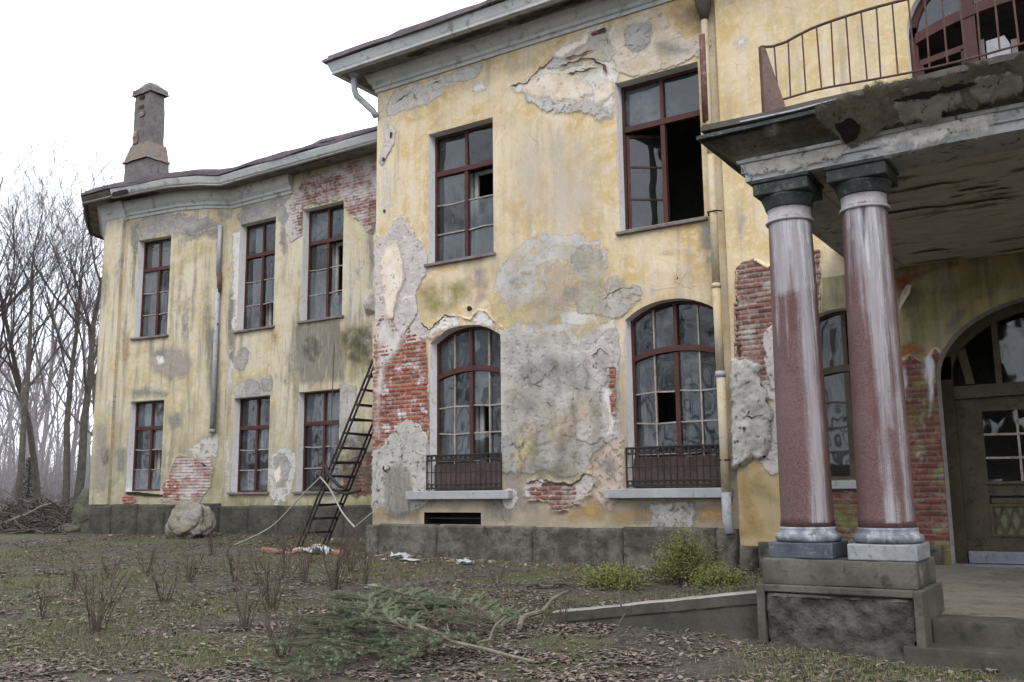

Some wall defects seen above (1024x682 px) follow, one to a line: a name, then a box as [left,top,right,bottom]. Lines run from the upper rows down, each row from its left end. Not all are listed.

peeling [385,63,486,117]
peeling [511,24,620,121]
damp [296,323,371,383]
spalling [122,153,642,516]
flaking render [733,258,775,389]
flaking render [814,249,824,313]
flaking render [902,347,950,550]